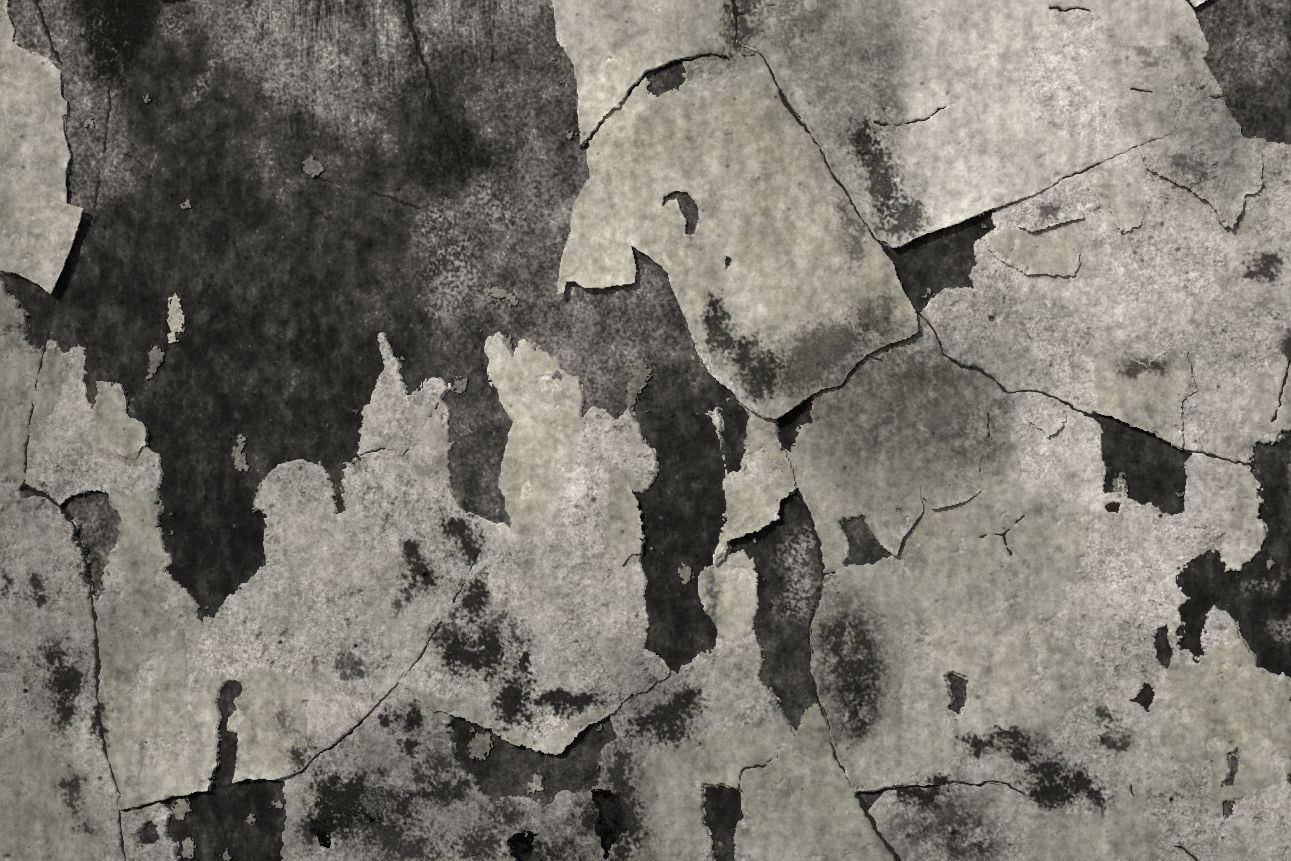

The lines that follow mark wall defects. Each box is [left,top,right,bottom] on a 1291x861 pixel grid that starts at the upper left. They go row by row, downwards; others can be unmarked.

crack [627,0,895,260]
leakage [849,120,923,245]
peeling [1185,0,1291,145]
peeling [0,0,1263,623]
crack [916,311,1255,472]
crack [20,302,363,861]
leakage [393,539,438,609]
leakage [291,686,702,861]
leakage [429,513,607,732]
peeling [118,411,1011,861]
crack [795,488,1035,861]
peeling [1154,431,1291,678]